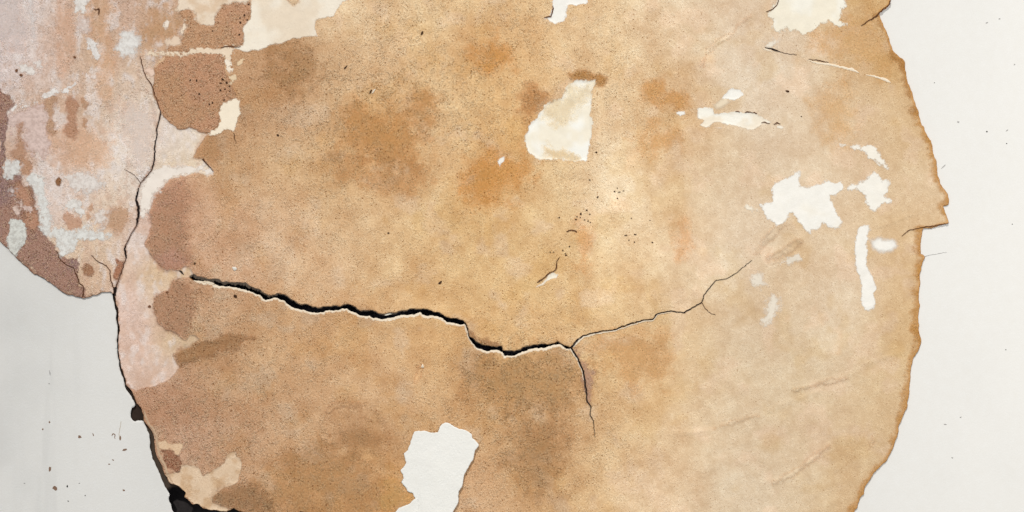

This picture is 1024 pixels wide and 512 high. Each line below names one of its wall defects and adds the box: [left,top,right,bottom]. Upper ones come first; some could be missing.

peeling [0,0,27,44]
leakage [151,2,251,133]
peeling [0,103,51,167]
peeling [127,104,155,163]
peeling [5,219,55,286]
peeling [26,171,112,256]
crack [57,57,240,512]
leakage [148,190,190,269]
leakage [154,282,193,333]
leakage [177,334,254,366]
crack [179,260,752,436]
leakage [162,450,181,473]